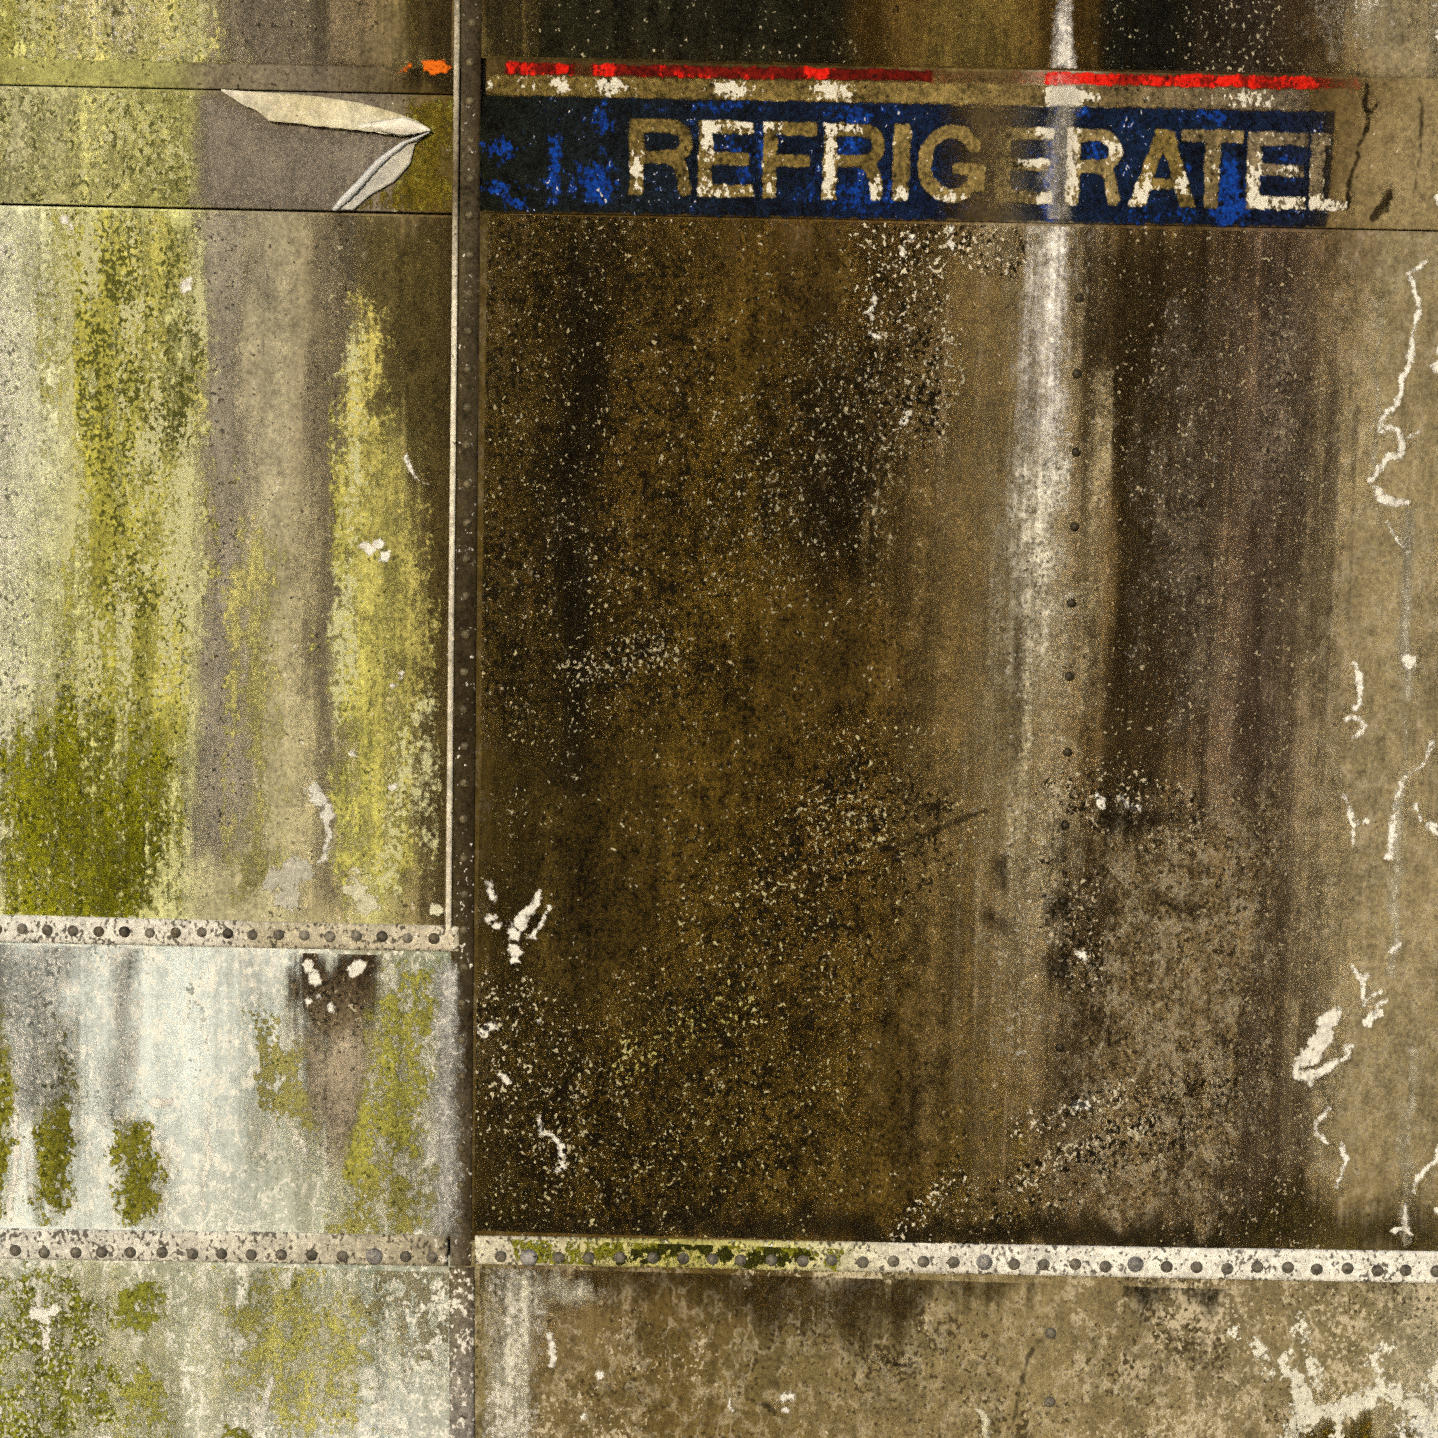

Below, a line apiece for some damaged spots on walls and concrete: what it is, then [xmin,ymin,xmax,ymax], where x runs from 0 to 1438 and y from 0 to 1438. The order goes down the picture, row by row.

leakage [0,0,329,65]
peeling [192,89,453,211]
peeling [1367,260,1438,548]
leakage [0,208,289,918]
leakage [306,215,452,923]
leakage [477,225,1438,1251]
leakage [0,944,83,1226]
leakage [104,951,169,1228]
peeling [1292,1006,1355,1087]
peeling [1351,964,1388,1028]
peeling [1391,1145,1438,1235]
peeling [1227,1311,1438,1438]